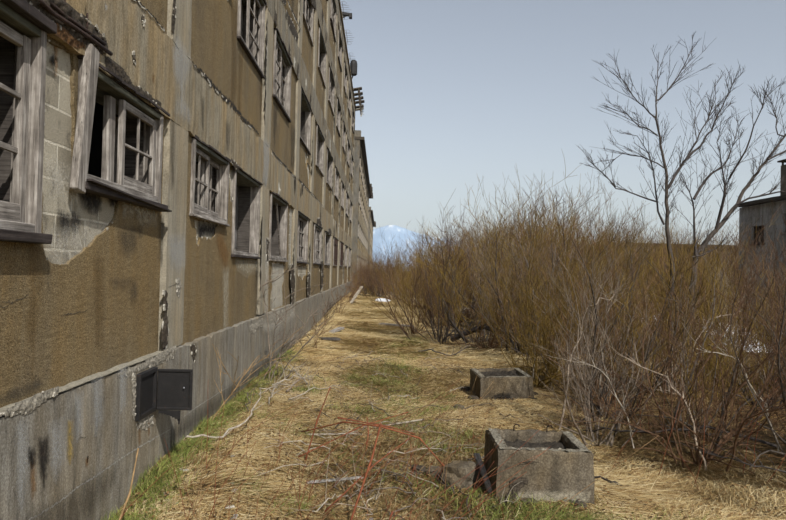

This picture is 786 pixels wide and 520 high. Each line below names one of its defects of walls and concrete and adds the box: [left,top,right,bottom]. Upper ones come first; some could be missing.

spalling [25,0,161,265]
spalling [0,386,59,417]
spalling [117,321,177,431]
water stain [28,437,49,485]